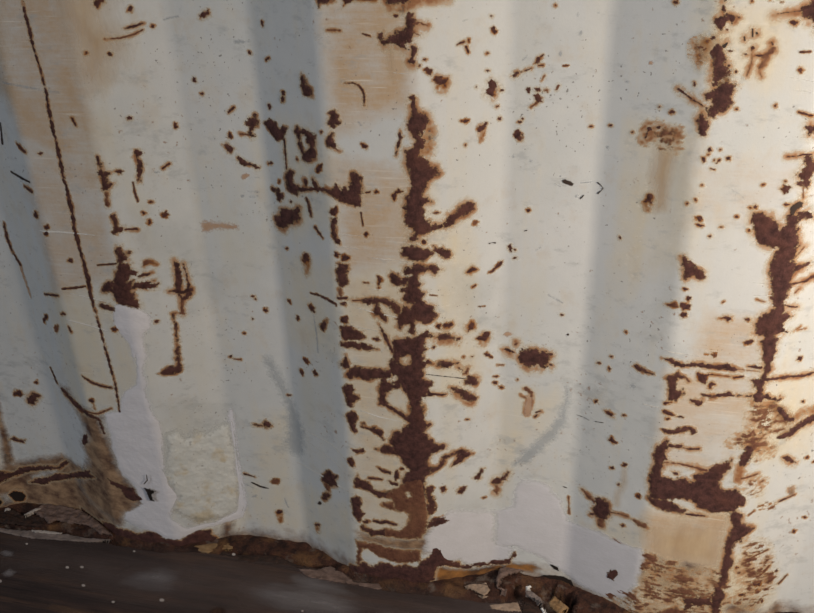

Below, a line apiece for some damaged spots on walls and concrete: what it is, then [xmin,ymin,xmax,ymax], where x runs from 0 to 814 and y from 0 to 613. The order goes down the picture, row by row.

rust [770,0,814,27]
rust [456,37,471,54]
rust [674,0,779,137]
rust [300,73,315,99]
rust [804,120,814,138]
rust [631,105,685,212]
rust [701,147,731,163]
rust [95,148,170,236]
rust [202,221,237,231]
rust [97,246,195,376]
rust [605,151,814,613]